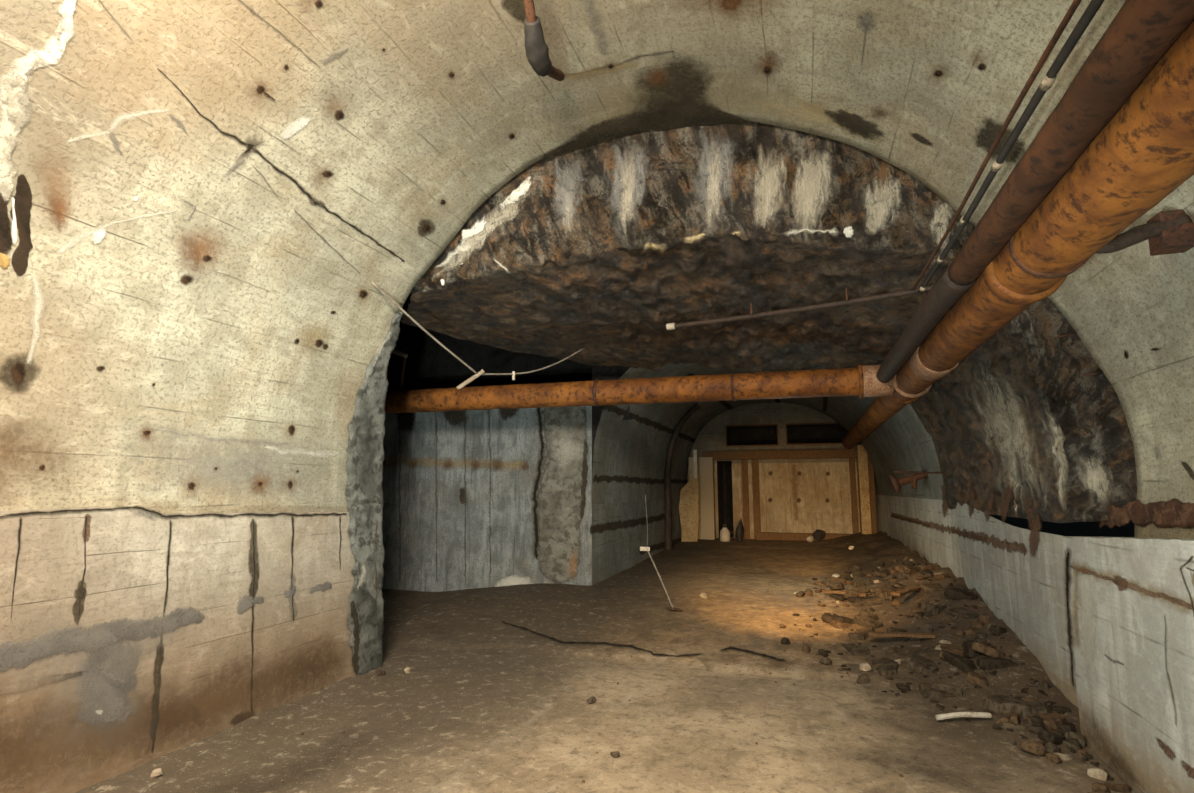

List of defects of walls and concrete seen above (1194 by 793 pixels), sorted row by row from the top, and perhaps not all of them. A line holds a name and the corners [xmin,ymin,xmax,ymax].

spalling [0,174,33,276]
corrosion [181,239,211,284]
crack [157,68,405,268]
water stain [440,60,884,285]
water stain [866,181,899,233]
water stain [911,133,932,145]
crack [0,506,346,753]
corrosion [1070,564,1194,610]